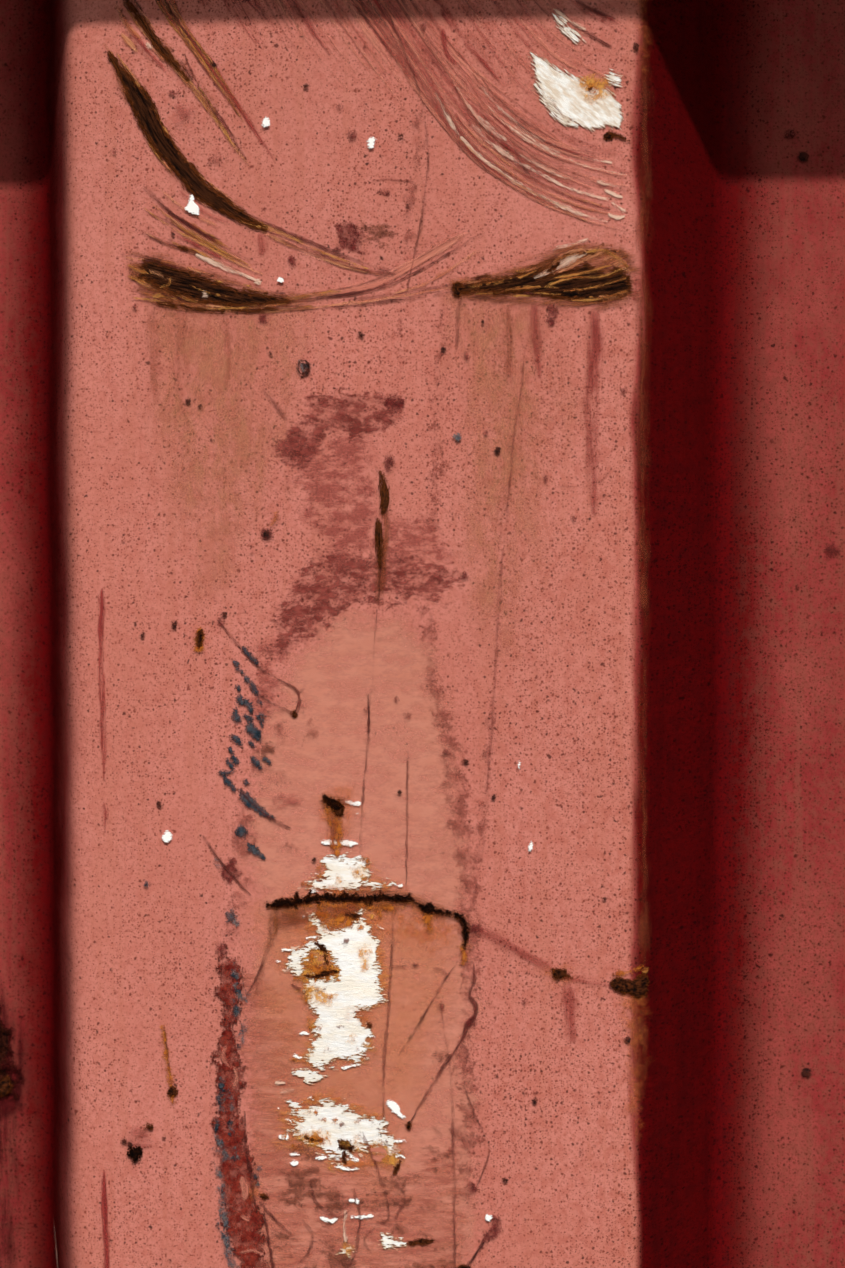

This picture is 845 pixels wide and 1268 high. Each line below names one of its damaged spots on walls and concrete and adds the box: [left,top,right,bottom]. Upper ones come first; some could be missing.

spalling [106,0,638,315]
rust [321,793,345,858]
rust [0,1002,24,1157]
peeling [207,951,289,1268]
peeling [275,839,457,1268]
rust [551,968,573,981]
rust [608,965,650,999]